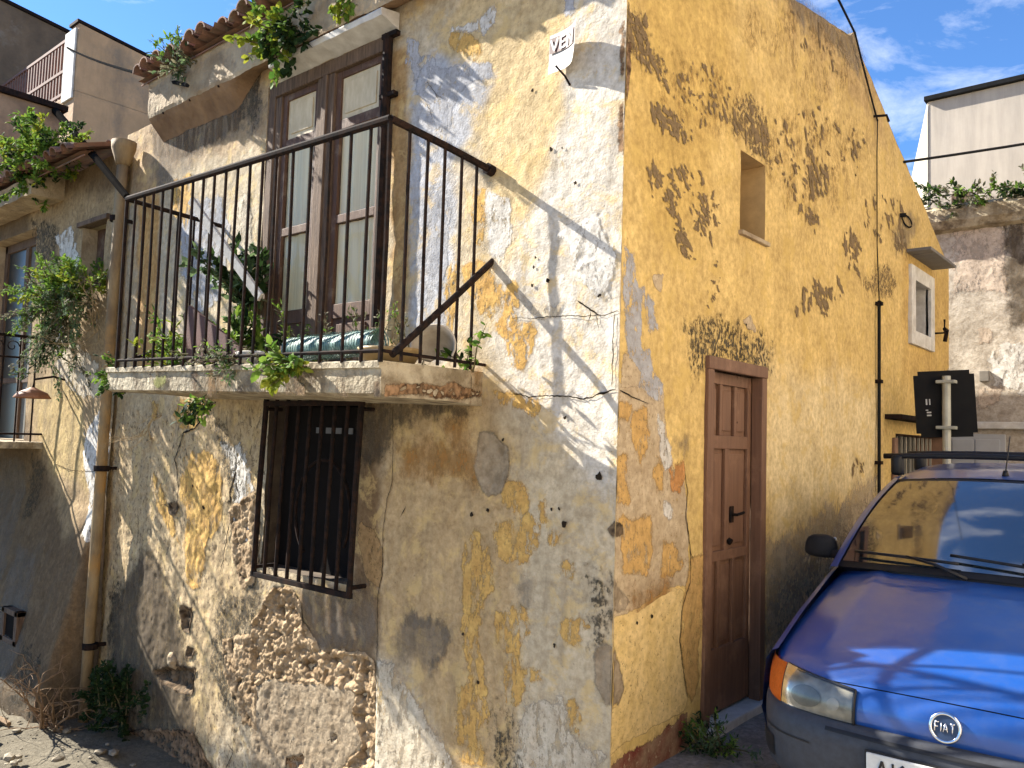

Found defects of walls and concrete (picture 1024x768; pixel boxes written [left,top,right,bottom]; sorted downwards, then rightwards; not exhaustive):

peeling [405,6,496,135]
peeling [617,10,866,235]
flaking render [373,381,481,400]
peeling [429,188,561,370]
crack [515,301,648,404]
peeling [646,159,721,260]
peeling [795,193,909,317]
peeling [152,441,260,589]
peeling [357,522,383,587]
peeling [454,210,703,768]
crack [664,436,694,696]
flaking render [222,586,376,768]